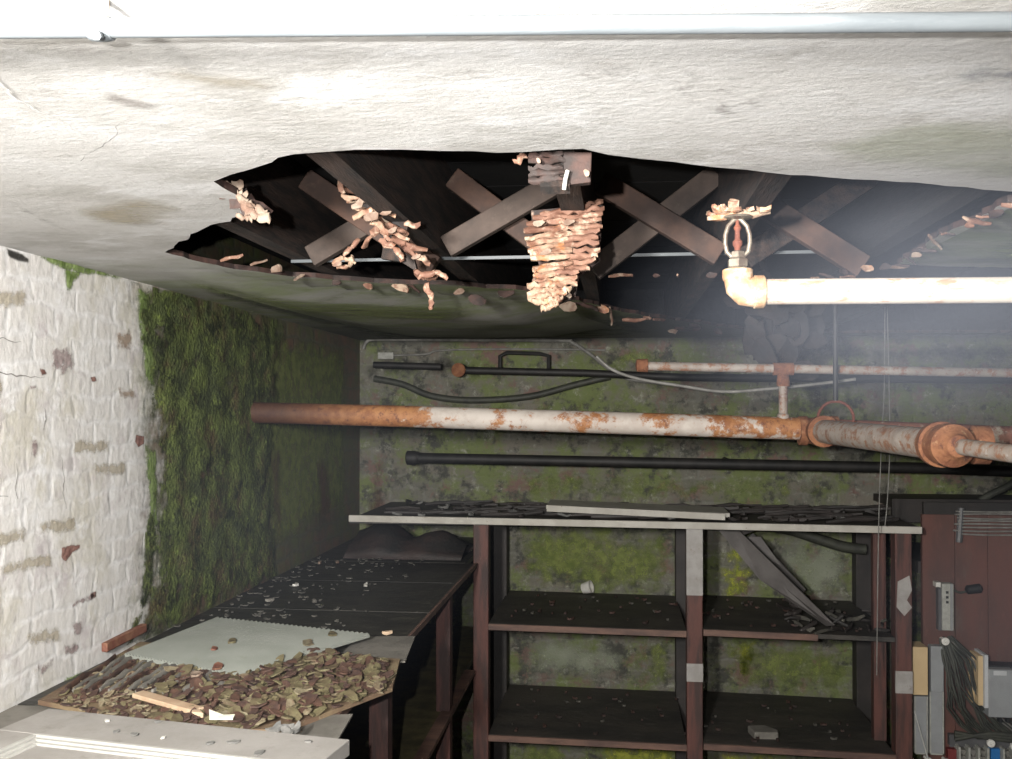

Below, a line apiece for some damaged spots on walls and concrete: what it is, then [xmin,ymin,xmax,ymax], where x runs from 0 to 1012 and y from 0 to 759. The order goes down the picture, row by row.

peeling [219,179,273,224]
peeling [351,198,392,222]
flaking render [962,202,1012,228]
flaking render [220,254,282,273]
flaking render [811,232,955,279]
leakage [213,291,459,338]
flaking render [391,284,420,293]
flaking render [453,288,486,306]
flaking render [559,291,723,335]
leakage [783,544,844,592]